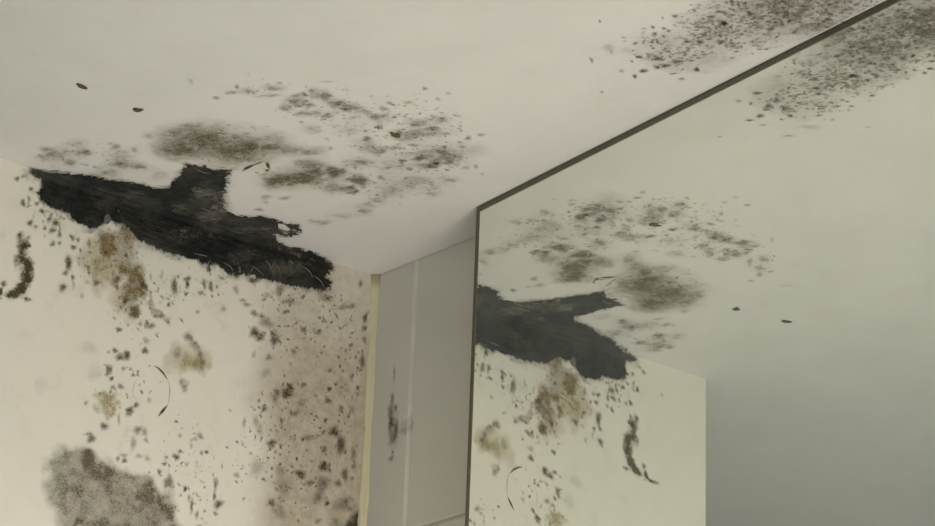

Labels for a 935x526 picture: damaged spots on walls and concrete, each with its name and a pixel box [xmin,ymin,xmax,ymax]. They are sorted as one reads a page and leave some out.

leakage [635,0,851,74]
leakage [165,133,281,157]
leakage [267,166,340,185]
leakage [0,234,33,300]
leakage [22,188,159,317]
leakage [51,435,181,526]